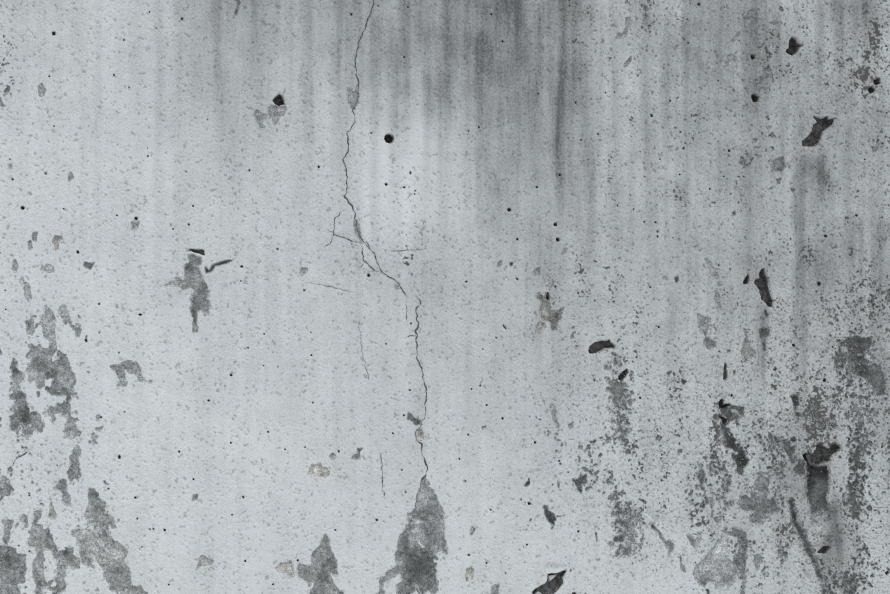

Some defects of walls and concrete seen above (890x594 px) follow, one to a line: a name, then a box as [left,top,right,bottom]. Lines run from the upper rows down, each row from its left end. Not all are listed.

leakage [141,0,890,379]
peeling [12,259,32,302]
peeling [164,254,232,333]
crack [326,0,428,594]
peeling [0,305,153,594]
peeling [276,534,344,594]
peeling [376,477,448,594]
spalling [544,561,566,581]